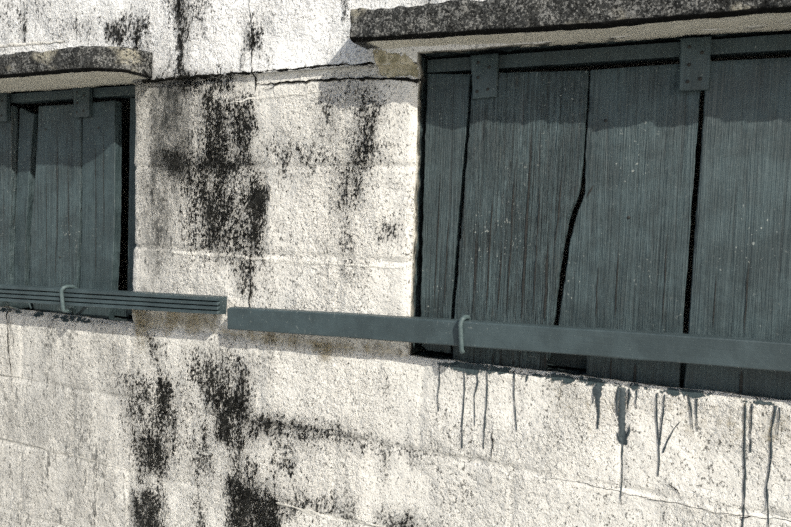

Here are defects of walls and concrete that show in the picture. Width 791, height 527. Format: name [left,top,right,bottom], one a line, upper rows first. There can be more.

crack [142,0,427,90]
water stain [0,0,405,299]
water stain [63,326,444,527]